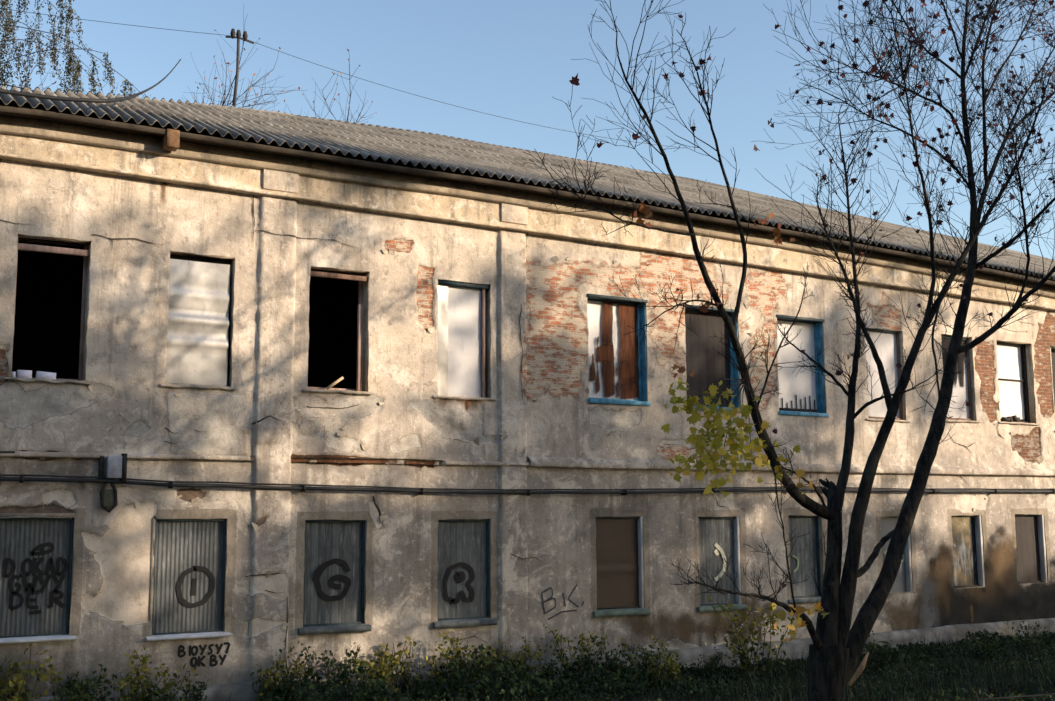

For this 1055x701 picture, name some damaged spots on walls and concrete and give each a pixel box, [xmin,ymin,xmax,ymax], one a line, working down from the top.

crack [92,234,154,247]
flaking render [382,238,414,255]
peeling [0,344,114,429]
flaking render [416,265,435,334]
flaking render [520,249,732,402]
flaking render [739,267,792,411]
flaking render [974,337,999,426]
flaking render [1010,312,1055,464]
flaking render [14,450,84,461]
spalling [0,487,77,517]
peeling [81,502,158,626]
water stain [888,528,1055,631]